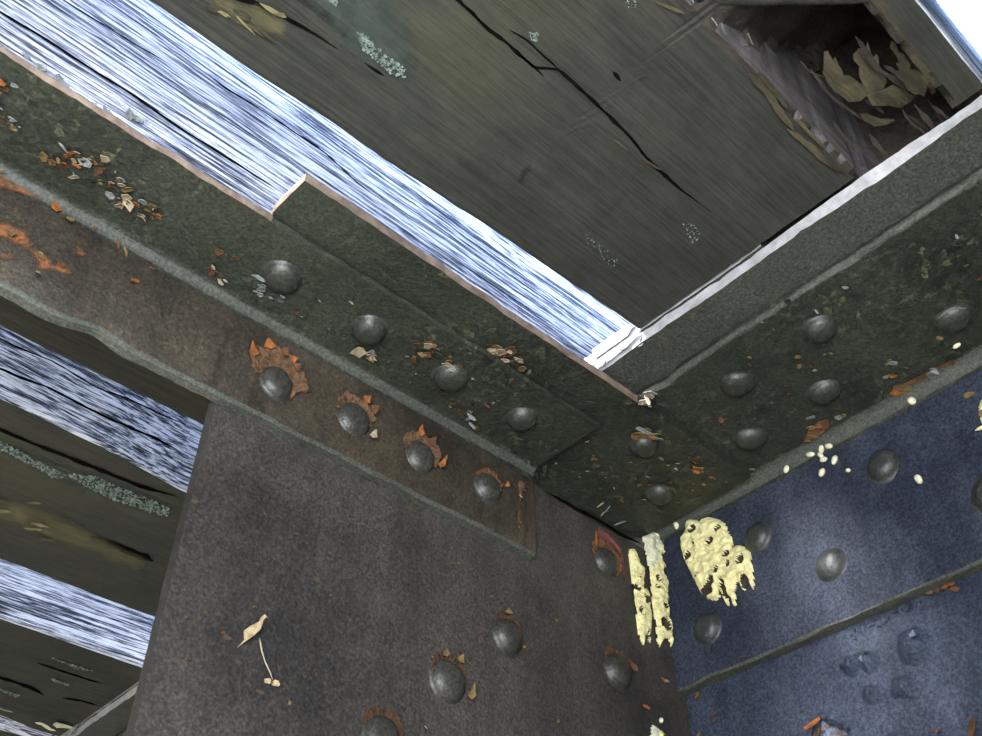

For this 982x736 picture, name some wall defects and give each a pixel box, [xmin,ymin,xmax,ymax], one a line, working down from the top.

crack [456,0,710,212]
rust [0,170,38,197]
rust [51,201,75,222]
rust [0,223,70,274]
crack [547,492,641,544]
rust [597,521,625,577]
peeling [803,710,859,736]